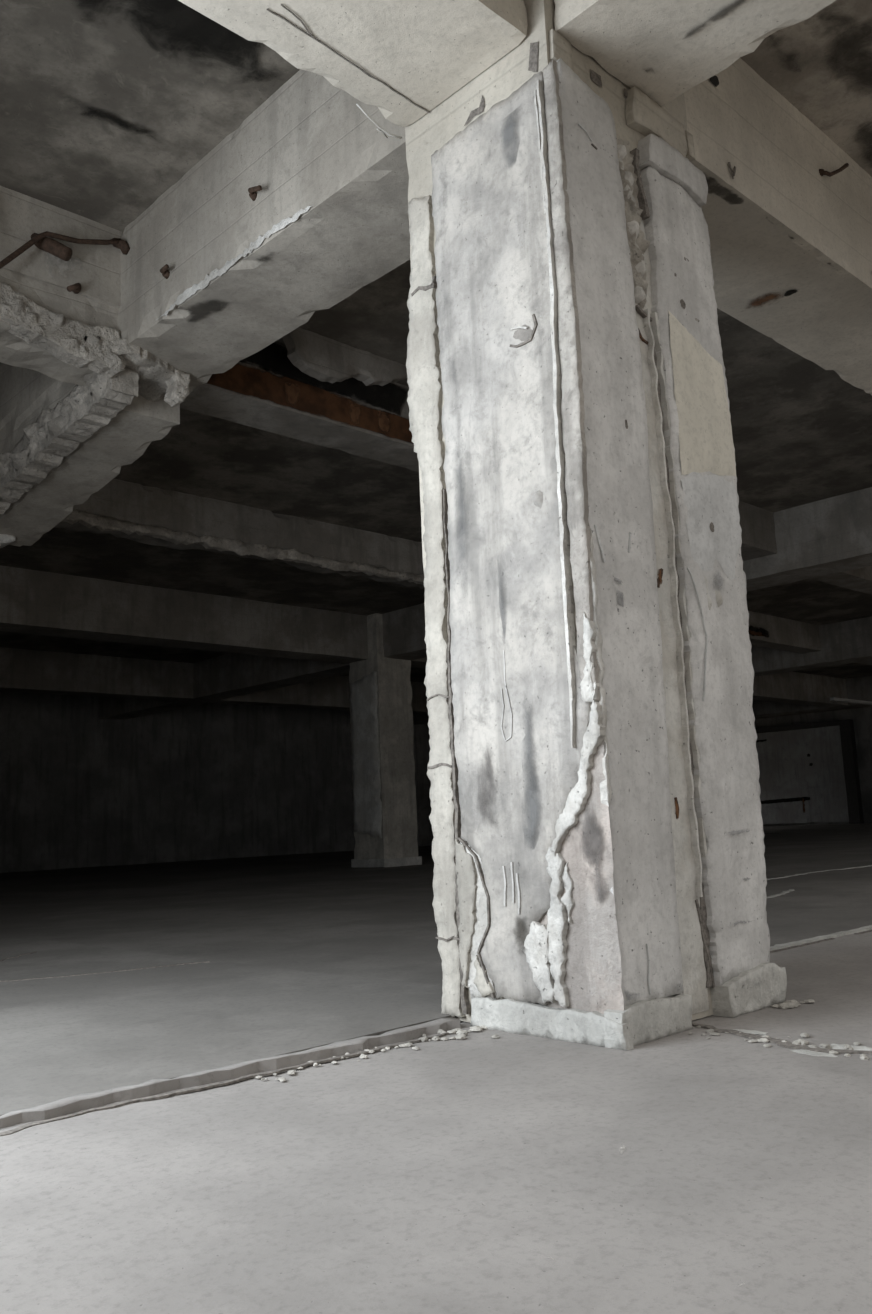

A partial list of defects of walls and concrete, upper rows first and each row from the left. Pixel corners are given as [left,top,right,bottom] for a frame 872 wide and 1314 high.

crack [266,4,430,113]
damp [685,0,745,38]
damp [820,15,872,88]
spalling [156,206,311,322]
rust [750,290,797,307]
spalling [0,231,191,514]
rust [207,363,414,444]
spalling [61,509,424,585]
rust [748,625,769,638]
crack [427,489,471,1014]
spalling [521,528,624,1014]
crack [692,1023,872,1057]